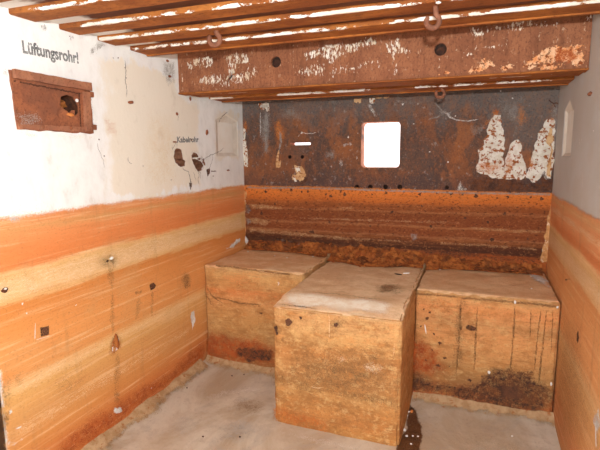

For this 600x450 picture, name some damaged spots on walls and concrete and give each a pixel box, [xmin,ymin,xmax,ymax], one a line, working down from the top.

rust [468,57,514,74]
rust [523,44,585,70]
spalling [174,148,205,172]
crack [183,152,218,190]
peeling [476,109,556,186]
rust [469,175,552,196]
damp [0,109,600,450]
crack [206,286,261,305]